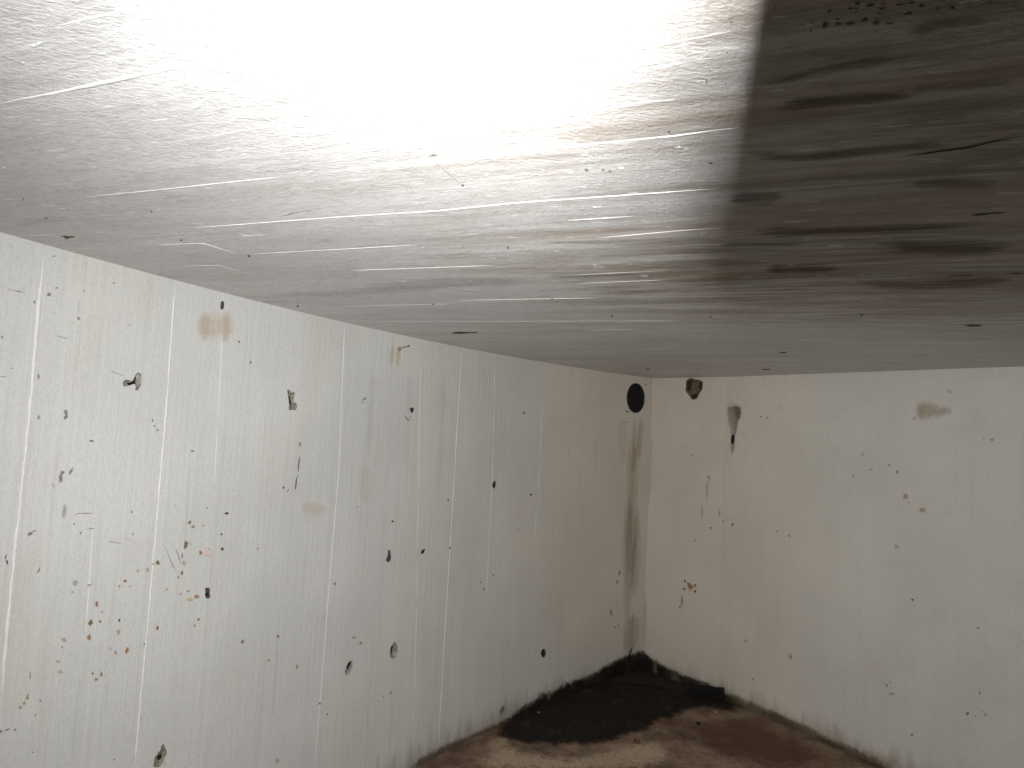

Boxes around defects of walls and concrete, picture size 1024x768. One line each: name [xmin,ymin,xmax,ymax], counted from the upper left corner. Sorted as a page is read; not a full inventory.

crack [905,136,1022,156]
spalling [123,373,142,391]
spalling [686,378,703,400]